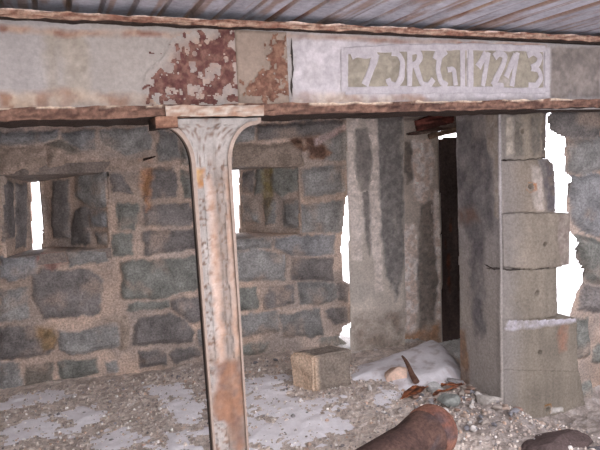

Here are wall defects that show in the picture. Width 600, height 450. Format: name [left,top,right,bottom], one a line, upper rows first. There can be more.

peeling [142,29,291,106]
crack [288,38,296,94]
corrosion [196,166,246,450]
water stain [312,117,442,352]